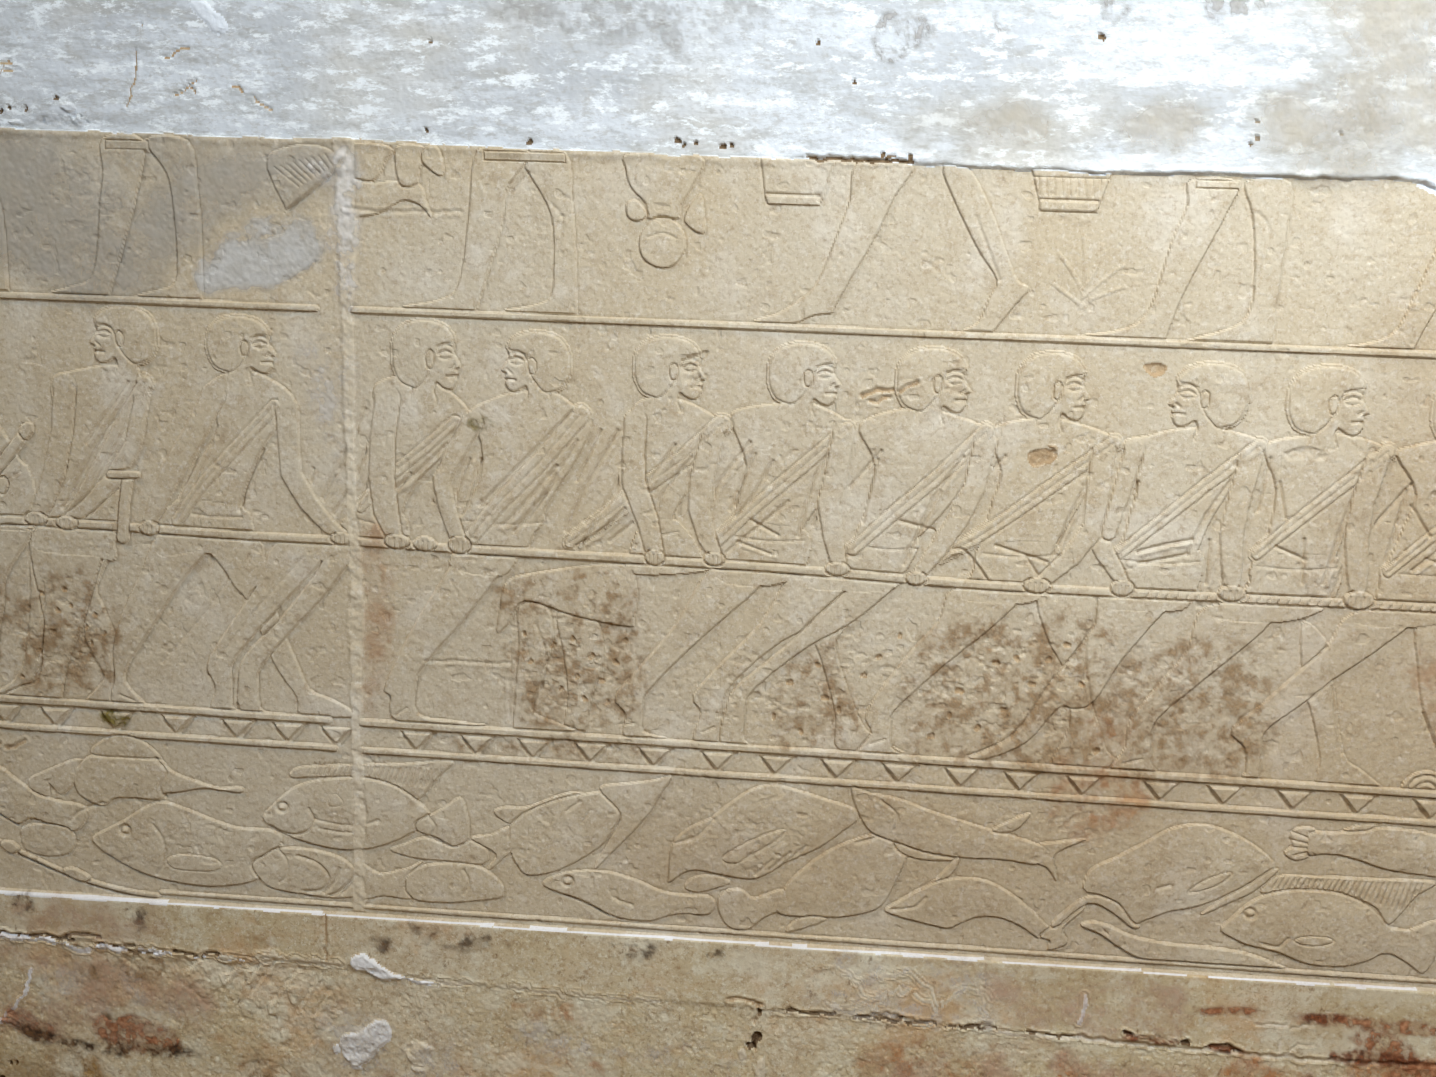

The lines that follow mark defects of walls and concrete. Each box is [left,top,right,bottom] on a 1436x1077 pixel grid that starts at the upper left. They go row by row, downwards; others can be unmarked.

crack [0,913,343,1027]
crack [727,971,1402,1067]